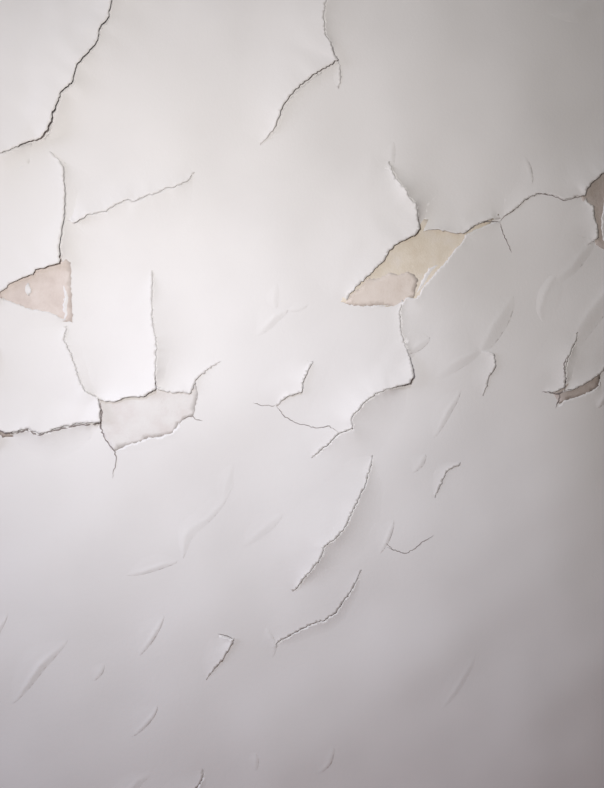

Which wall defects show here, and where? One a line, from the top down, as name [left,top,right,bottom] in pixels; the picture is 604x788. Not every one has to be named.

peeling [237,0,366,145]
peeling [0,0,221,460]
peeling [257,150,505,657]
peeling [529,174,604,406]
peeling [202,634,234,680]